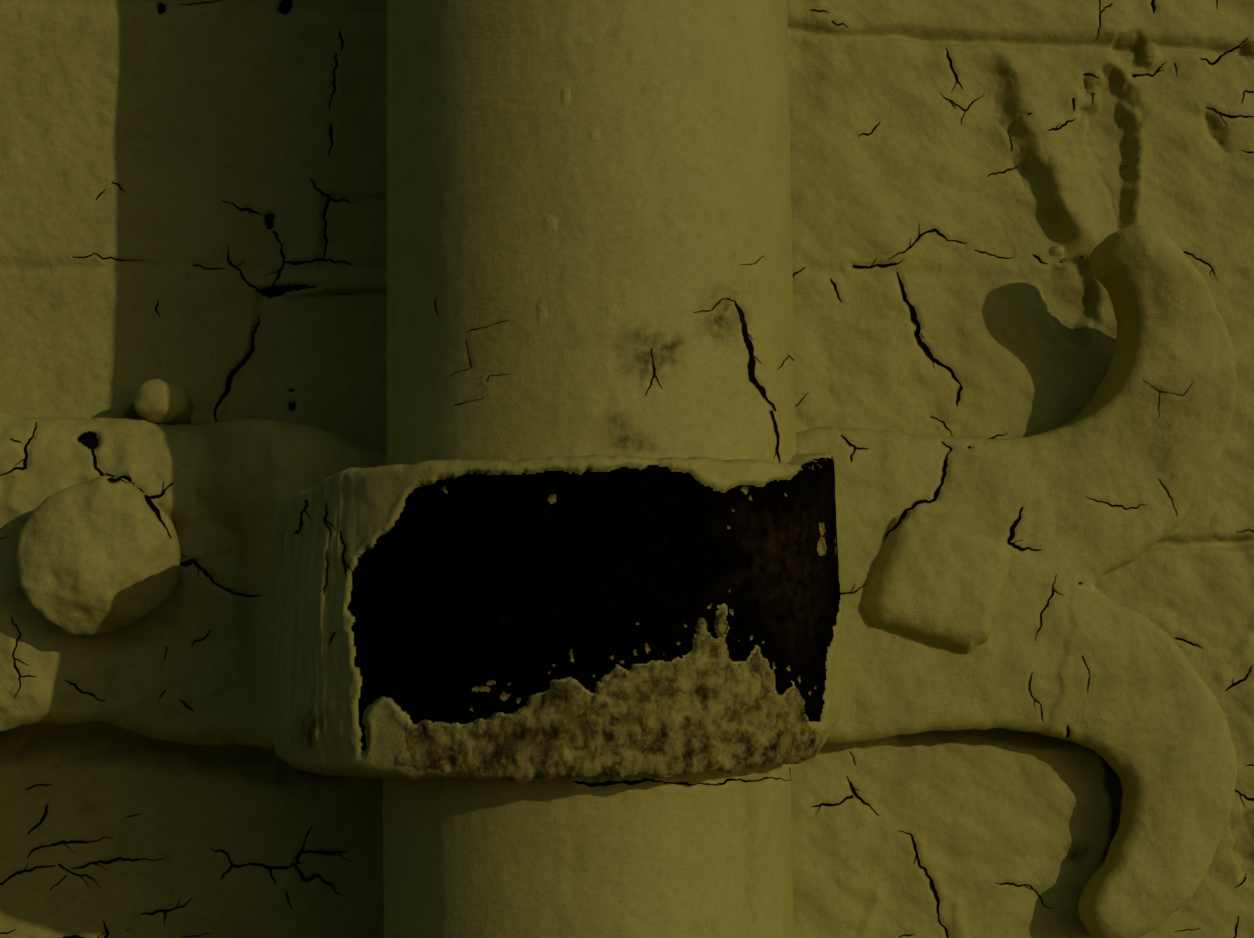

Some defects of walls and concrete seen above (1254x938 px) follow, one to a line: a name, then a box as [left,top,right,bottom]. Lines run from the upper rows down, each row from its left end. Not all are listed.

crack [987,73,1100,177]
crack [1095,0,1113,42]
crack [1133,37,1249,77]
crack [193,30,355,422]
crack [694,298,809,462]
crack [793,223,1083,540]
crack [92,450,261,597]
crack [294,500,354,594]
peeling [348,457,840,783]
crack [0,784,163,891]
crack [210,824,350,910]
crack [812,752,949,938]